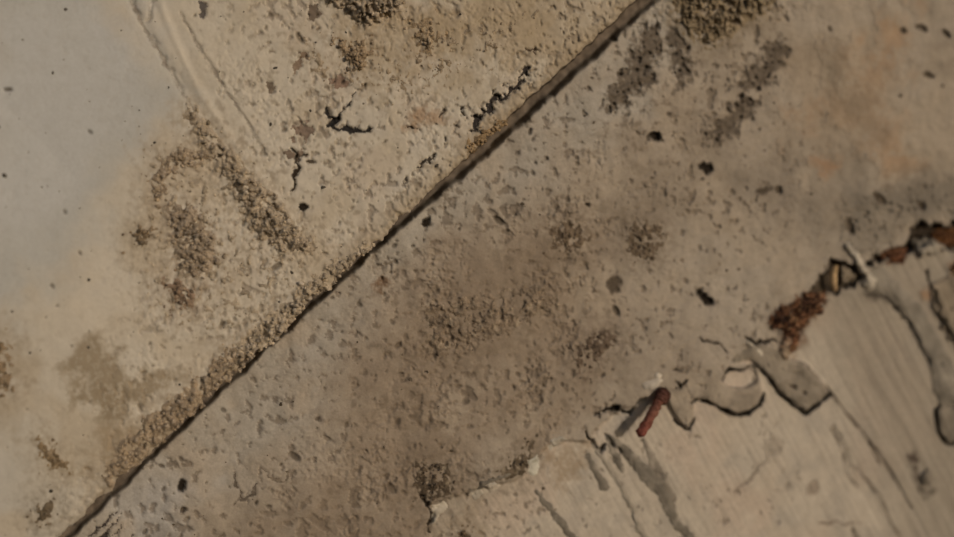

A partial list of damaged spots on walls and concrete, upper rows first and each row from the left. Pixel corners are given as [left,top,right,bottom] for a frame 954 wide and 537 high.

crack [325,92,373,135]
spalling [621,219,667,272]
spalling [808,173,954,296]
spalling [565,328,624,380]
peeling [641,373,663,391]
crack [419,494,433,533]